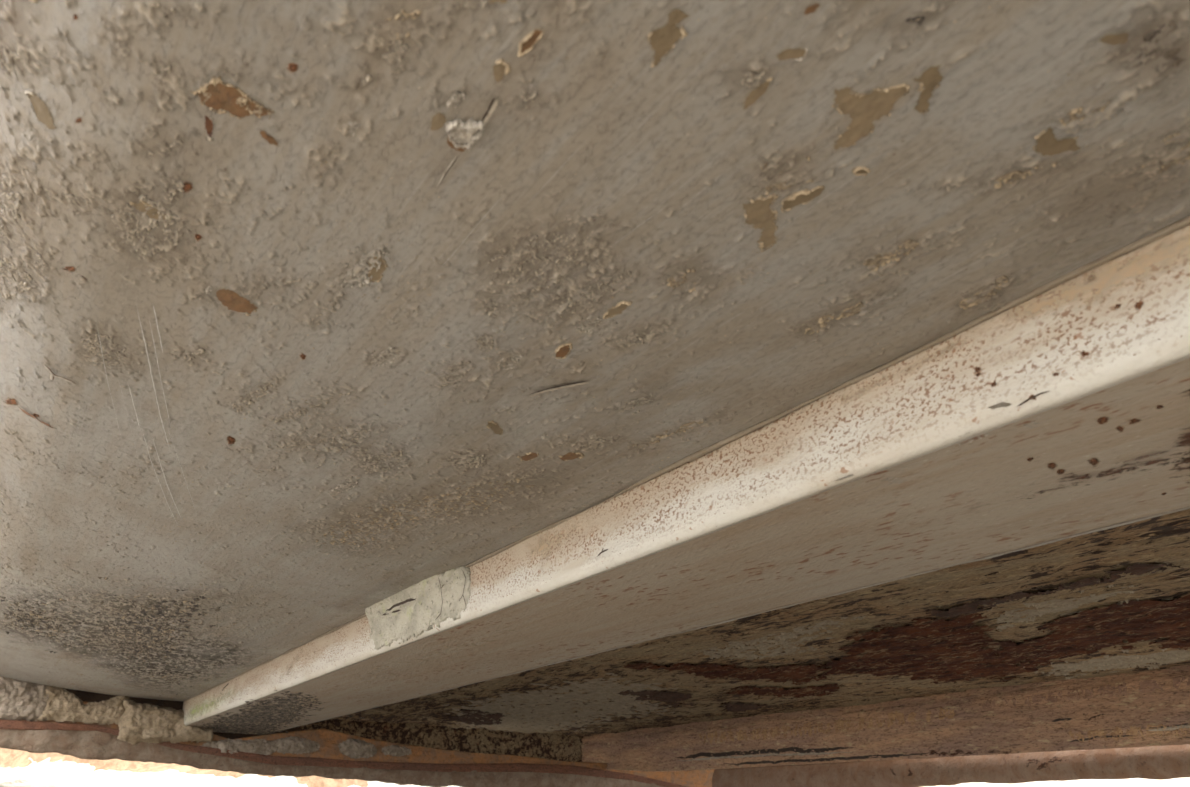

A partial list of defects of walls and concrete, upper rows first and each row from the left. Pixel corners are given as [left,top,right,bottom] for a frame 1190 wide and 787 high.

peeling [646,9,689,68]
peeling [190,75,279,147]
peeling [430,113,486,152]
peeling [831,65,944,150]
peeling [1032,126,1081,156]
peeling [742,186,825,252]
peeling [215,288,259,316]
rust [1095,417,1139,431]
rust [1028,427,1190,499]
rust [618,560,1190,712]